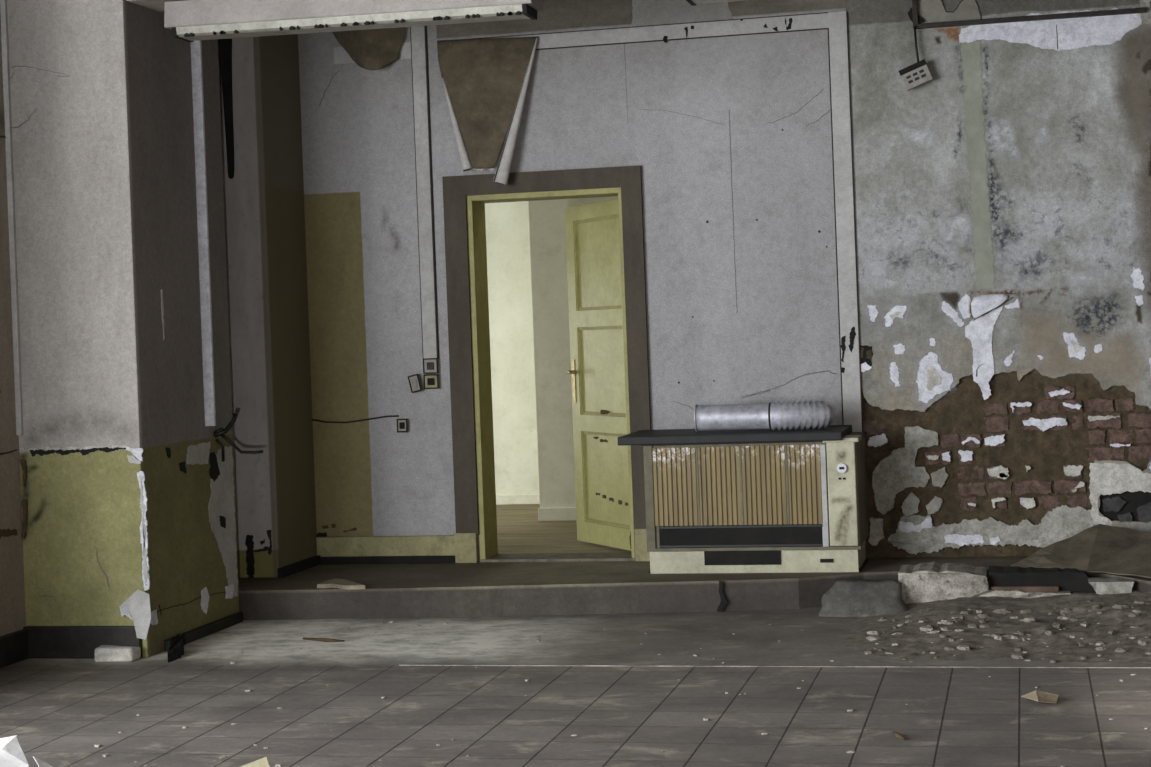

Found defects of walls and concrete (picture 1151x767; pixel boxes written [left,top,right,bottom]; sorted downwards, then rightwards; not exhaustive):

spalling [862,294,1151,558]
flaking render [201,587,210,614]
flaking render [166,442,272,599]
crack [717,581,727,612]